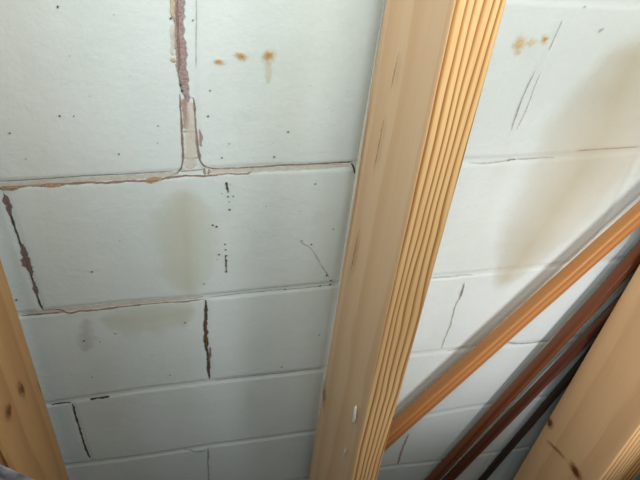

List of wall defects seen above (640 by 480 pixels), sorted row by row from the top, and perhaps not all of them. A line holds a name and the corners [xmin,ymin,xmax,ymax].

crack [0,0,355,379]
crack [52,402,90,457]